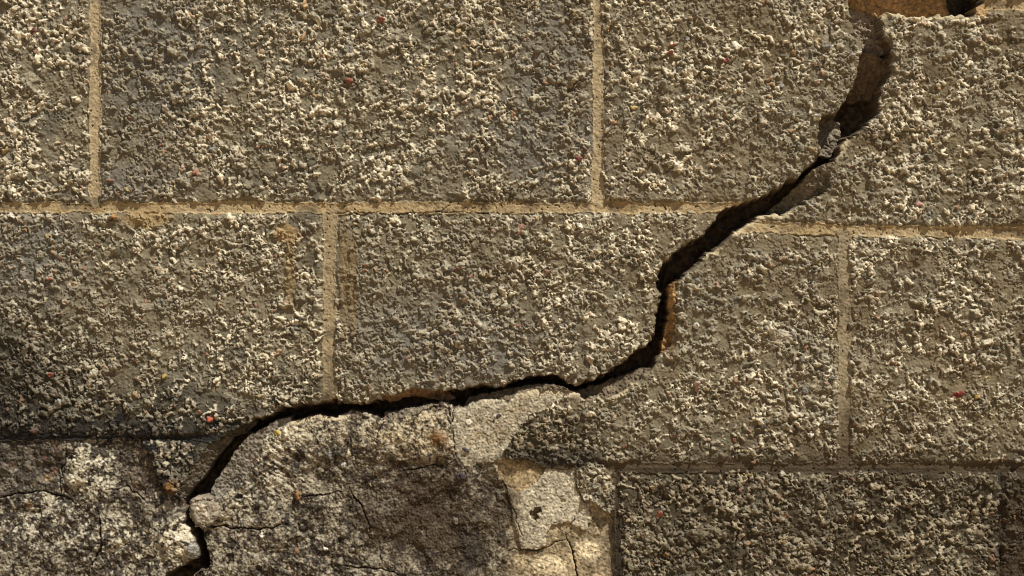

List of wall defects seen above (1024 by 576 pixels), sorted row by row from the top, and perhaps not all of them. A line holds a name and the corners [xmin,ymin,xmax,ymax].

crack [167,0,985,576]